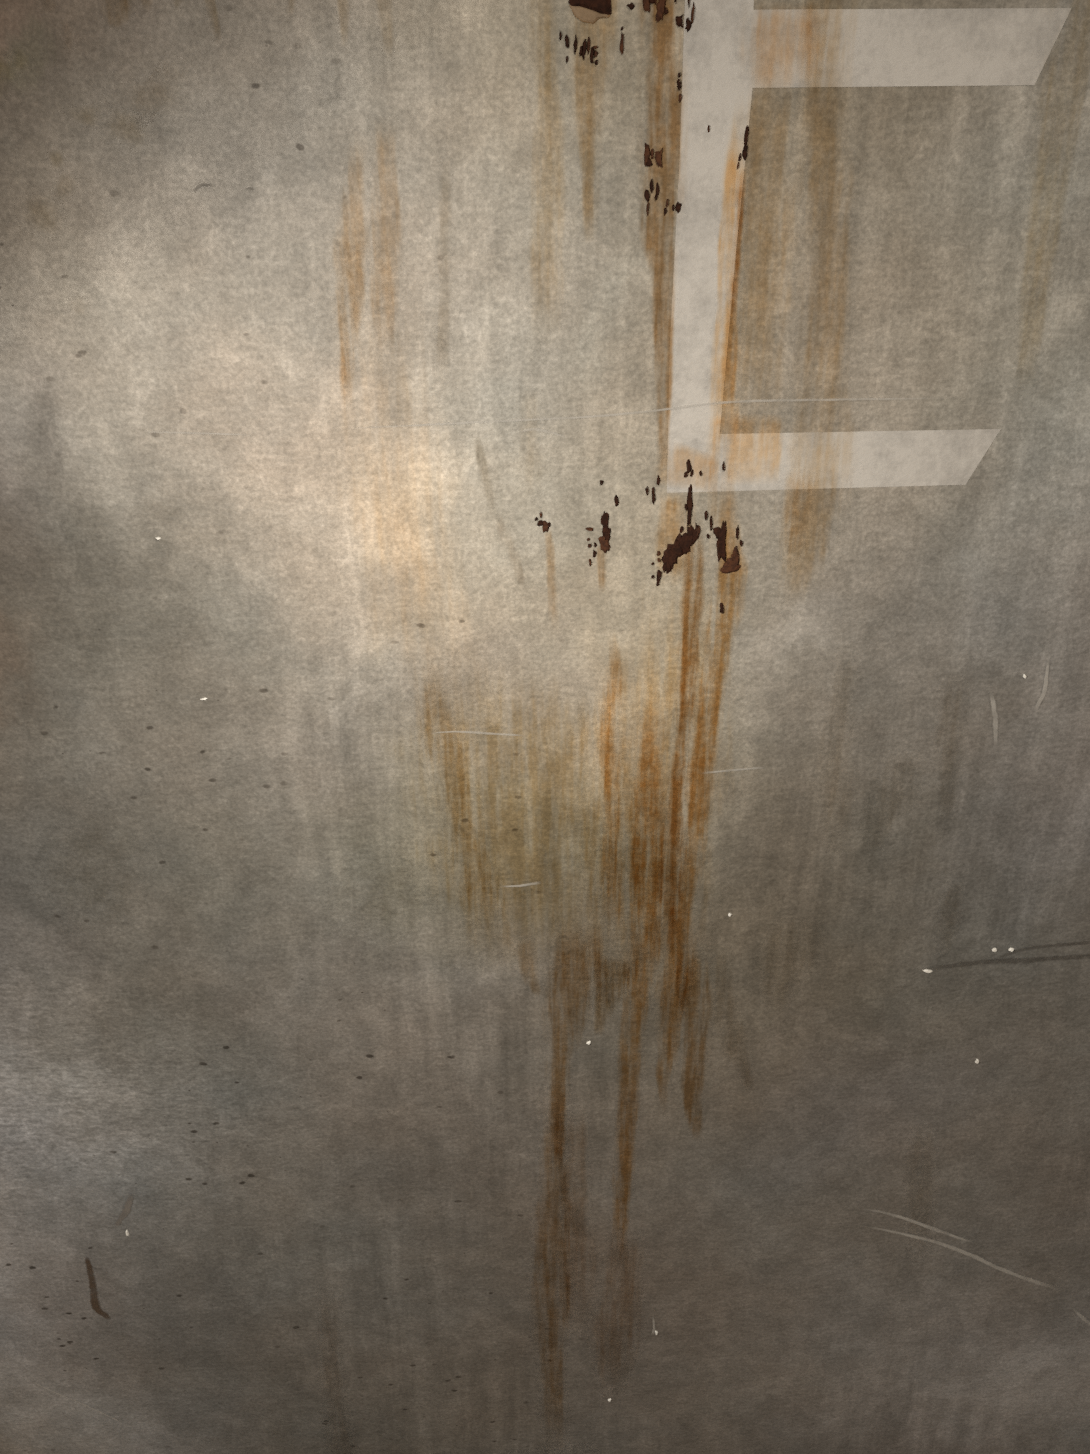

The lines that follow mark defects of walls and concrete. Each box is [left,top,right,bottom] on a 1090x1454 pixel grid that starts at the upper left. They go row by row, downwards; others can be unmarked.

spalling [559,0,695,65]